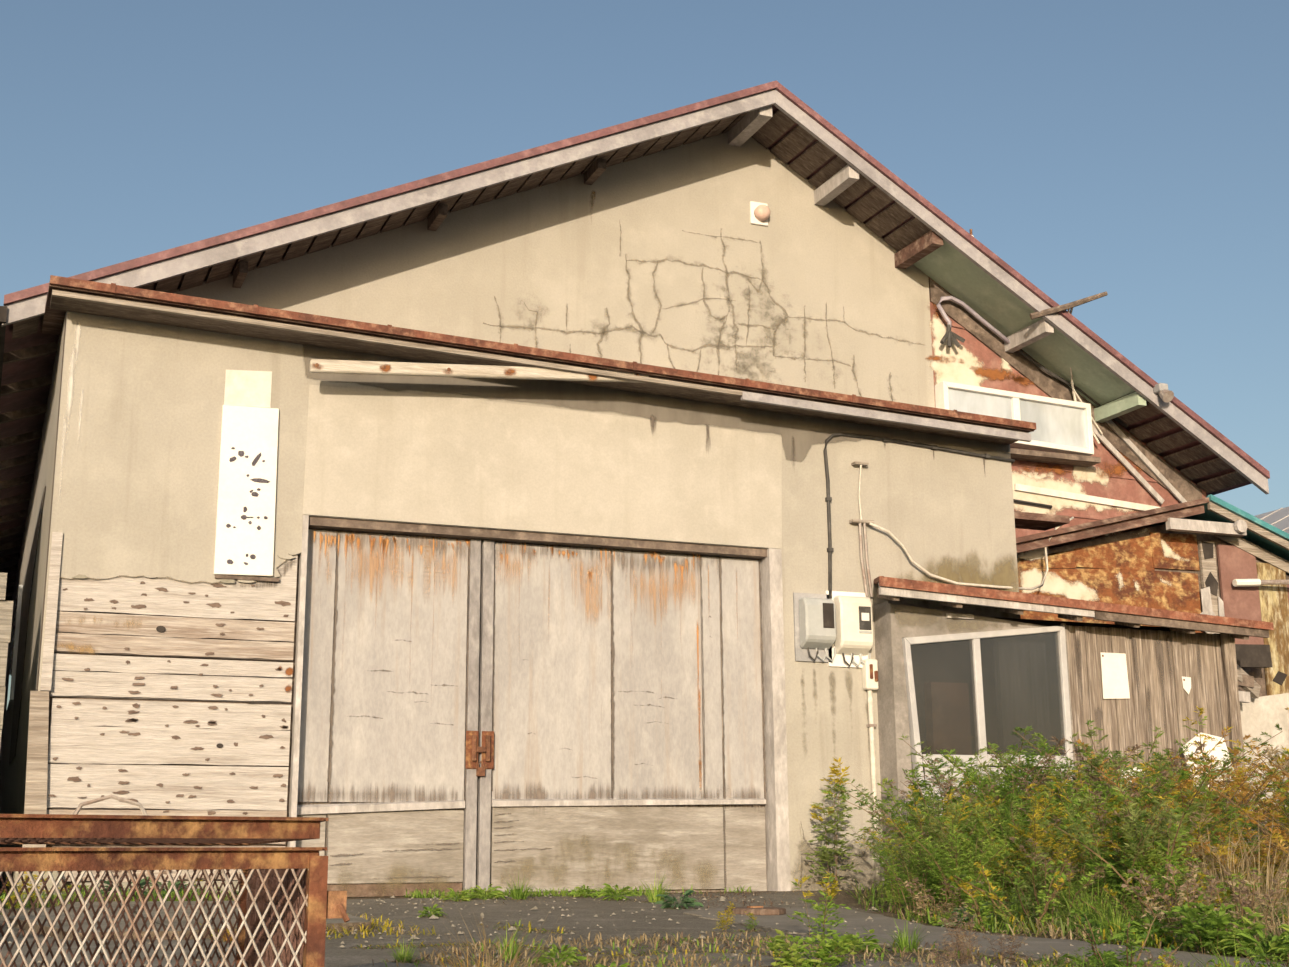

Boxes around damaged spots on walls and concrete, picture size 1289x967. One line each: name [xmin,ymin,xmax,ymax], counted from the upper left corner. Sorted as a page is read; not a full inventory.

peeling [930,315,987,387]
leakage [303,345,1009,470]
peeling [1012,466,1133,515]
peeling [84,574,168,610]
spalling [184,552,298,635]
corrosion [314,531,470,591]
corrosion [635,551,700,611]
leakage [924,559,1018,592]
corrosion [1017,532,1201,624]
peeling [100,647,145,736]
peeling [165,652,232,761]
peeling [67,767,138,802]